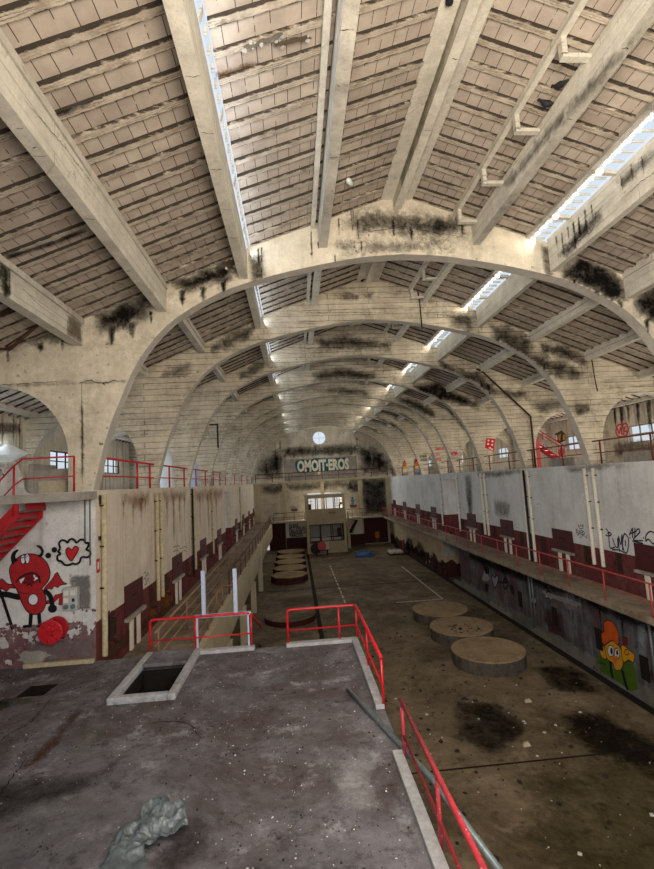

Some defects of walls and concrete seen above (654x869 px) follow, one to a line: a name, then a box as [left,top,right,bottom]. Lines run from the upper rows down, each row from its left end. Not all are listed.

water stain [351,212,463,251]
water stain [555,205,625,307]
mould [96,296,152,345]
water stain [635,288,654,331]
peeling [0,623,41,668]
peeling [67,609,96,641]
rust [27,716,77,766]
water stain [459,704,523,751]
water stain [567,715,654,765]